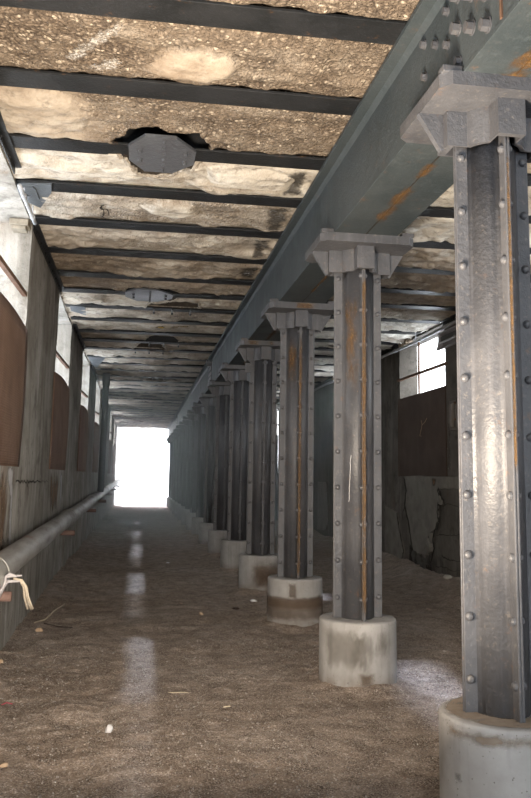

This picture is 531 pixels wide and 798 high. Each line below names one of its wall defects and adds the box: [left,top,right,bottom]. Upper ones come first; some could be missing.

spalling [116,154,202,179]
spalling [104,122,218,150]
corrosion [507,182,517,466]
corrosion [346,282,366,539]
peeling [385,476,459,570]